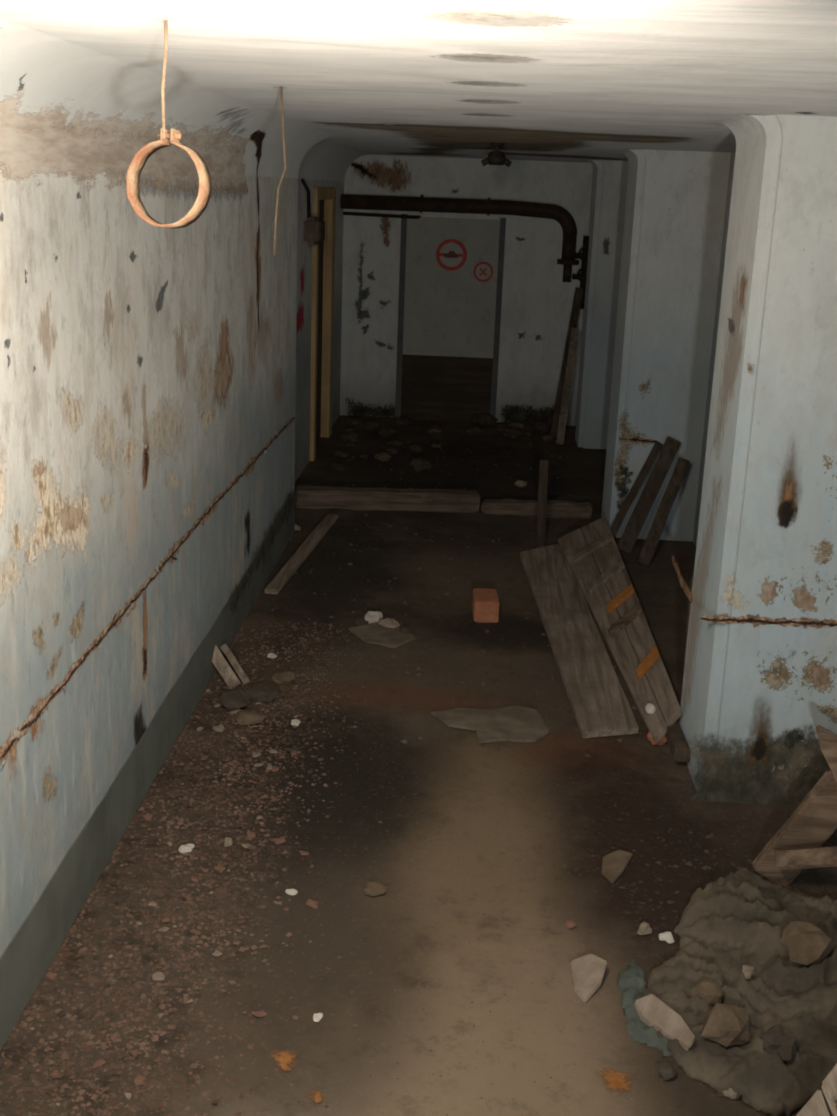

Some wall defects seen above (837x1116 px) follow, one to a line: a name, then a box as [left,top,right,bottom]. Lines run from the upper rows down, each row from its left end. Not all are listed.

peeling [0,74,250,199]
leakage [504,152,620,160]
peeling [59,387,141,473]
peeling [0,438,115,605]
crack [0,416,295,771]
crack [672,555,837,628]
peeling [720,538,837,615]
peeling [756,651,837,724]
leakage [687,726,832,806]